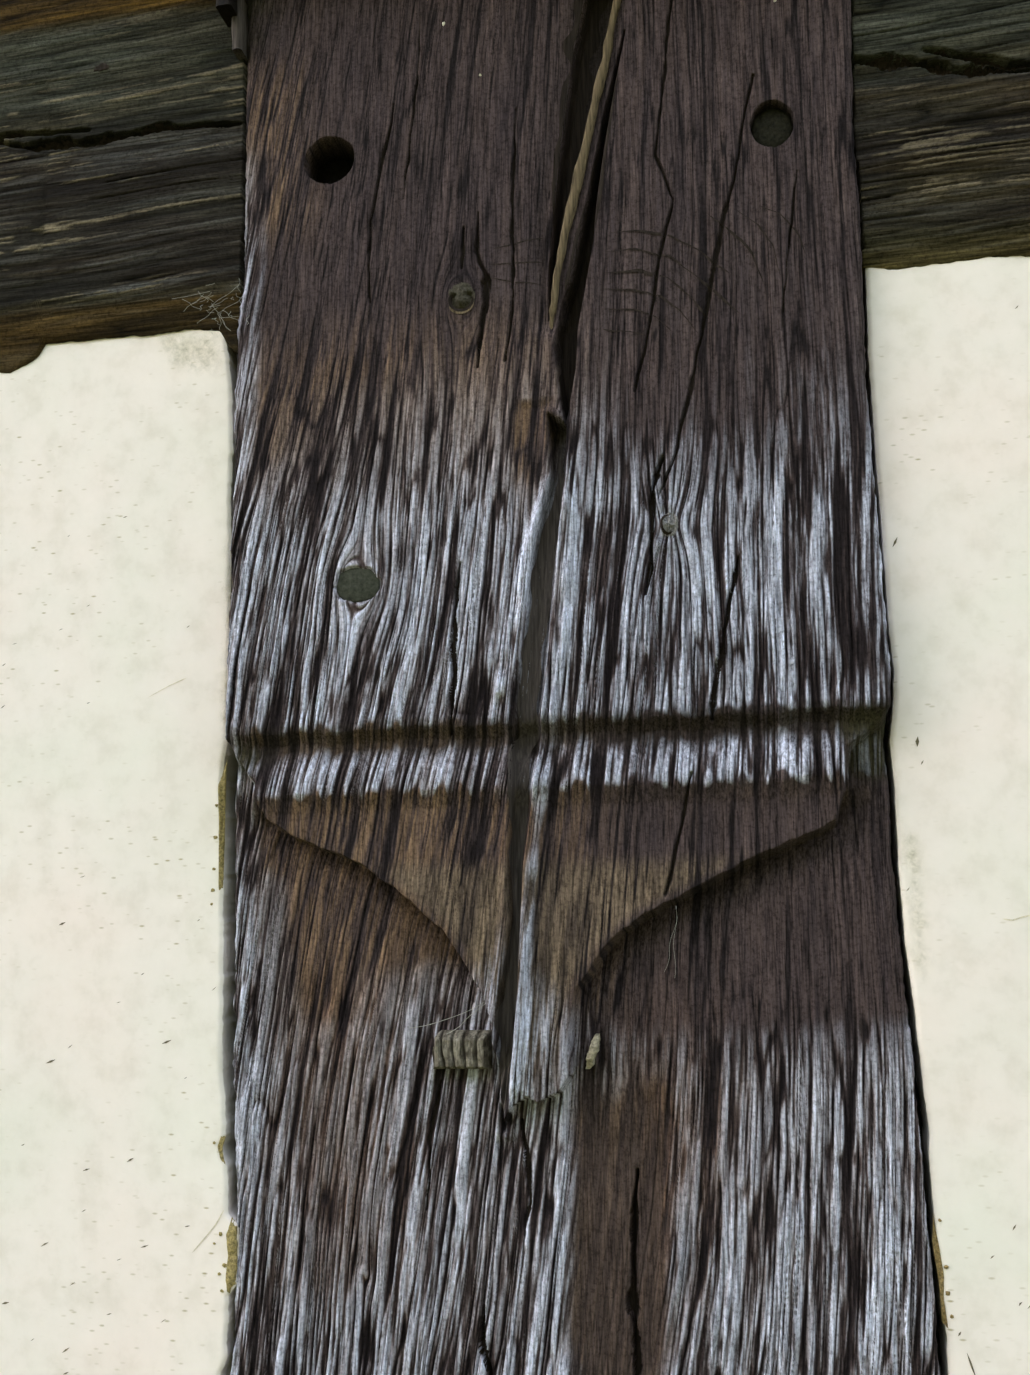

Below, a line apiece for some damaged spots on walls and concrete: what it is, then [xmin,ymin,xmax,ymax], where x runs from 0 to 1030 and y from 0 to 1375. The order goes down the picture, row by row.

crack [448,0,806,1234]